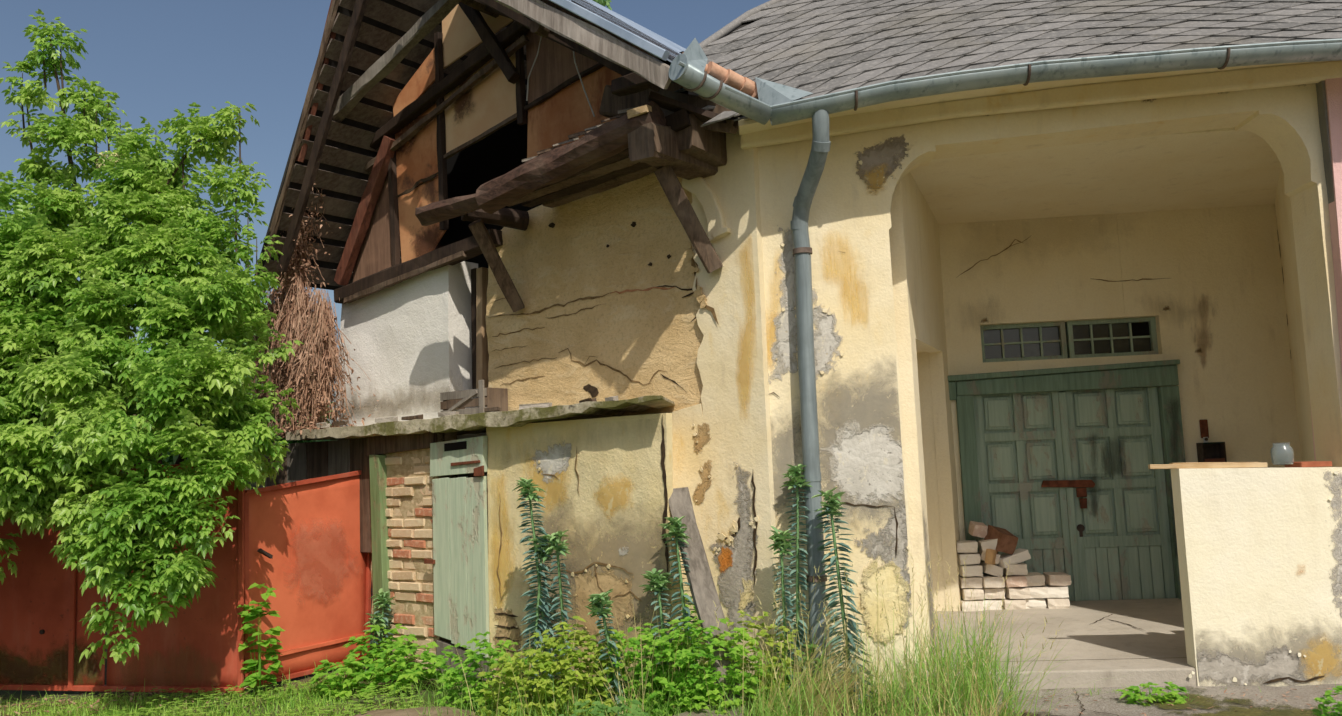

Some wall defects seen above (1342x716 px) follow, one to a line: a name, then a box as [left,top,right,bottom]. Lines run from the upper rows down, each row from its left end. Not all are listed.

crack [522,242,718,324]
crack [559,348,686,392]
peeling [768,228,799,384]
crack [495,493,503,597]
crack [542,449,580,496]
damp [531,463,665,650]
crack [661,415,669,578]
spalling [692,423,712,505]
peeling [709,462,759,639]
peeling [820,418,912,636]
peeling [1324,471,1342,617]
damp [1196,630,1342,686]